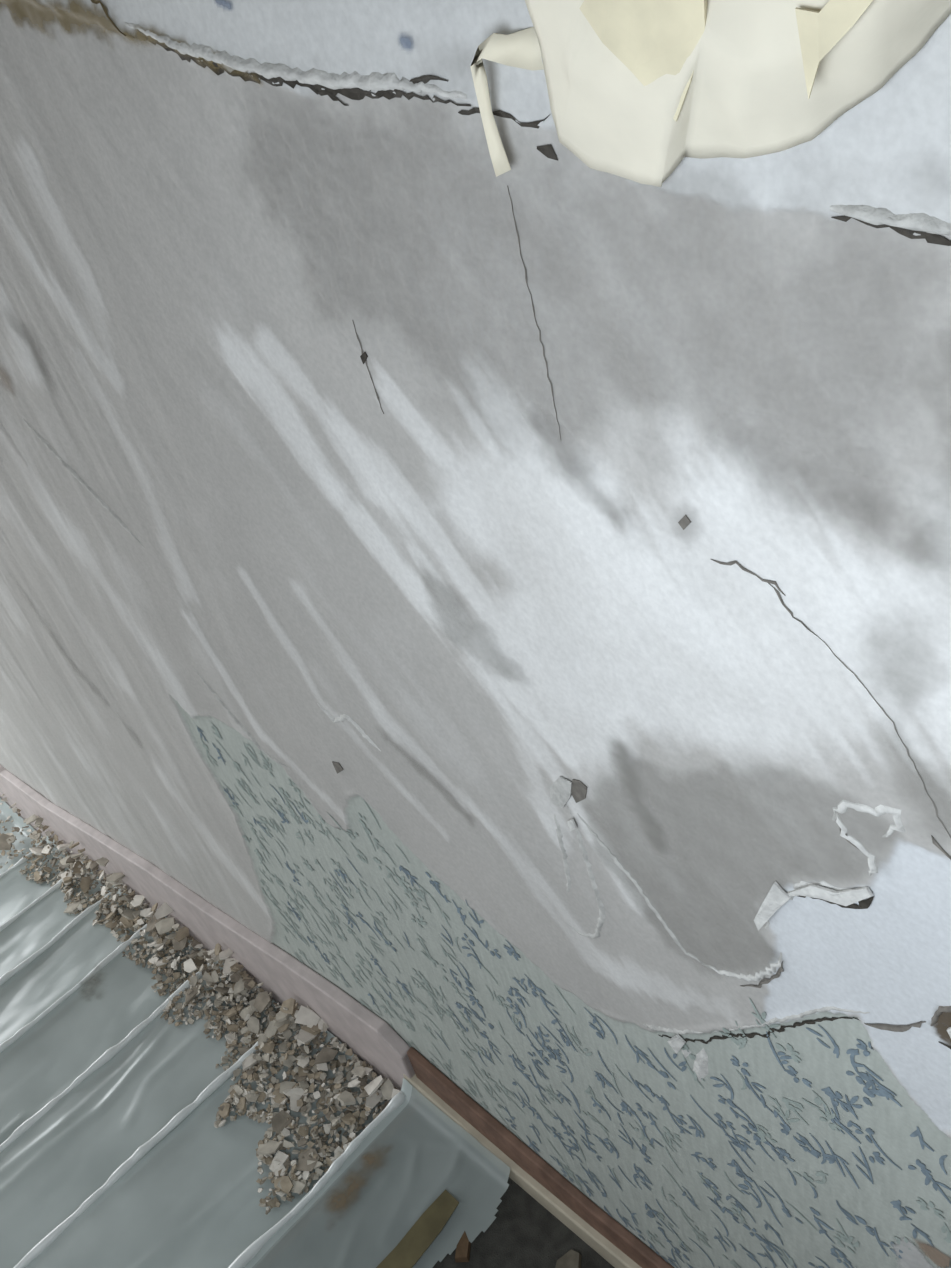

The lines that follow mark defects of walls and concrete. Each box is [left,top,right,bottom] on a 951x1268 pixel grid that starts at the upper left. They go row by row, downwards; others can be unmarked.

crack [125,22,558,160]
crack [830,205,951,246]
crack [507,186,561,439]
crack [352,320,384,414]
water stain [678,515,691,530]
crack [711,559,951,860]
spalling [550,776,587,831]
flaking render [754,800,906,931]
flaking render [701,952,784,988]
flaking render [643,1006,951,1054]